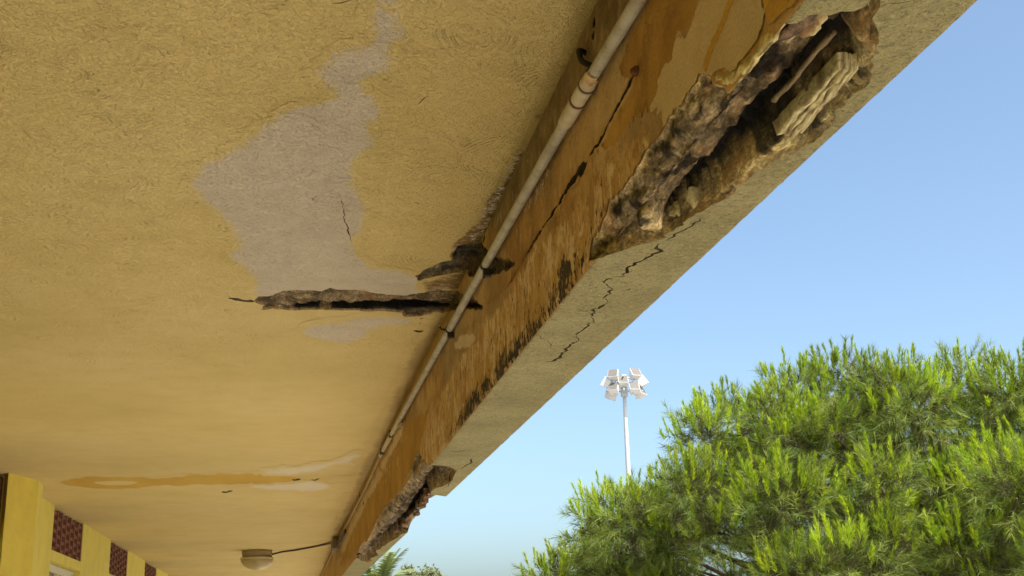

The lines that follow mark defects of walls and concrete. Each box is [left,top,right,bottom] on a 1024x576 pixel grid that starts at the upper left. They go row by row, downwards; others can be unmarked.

water stain [52,312,446,567]
corrosion [325,0,700,572]
water stain [448,243,589,440]
water stain [416,0,631,293]
peeling [180,0,880,564]
crack [511,76,634,282]
crack [540,218,701,363]